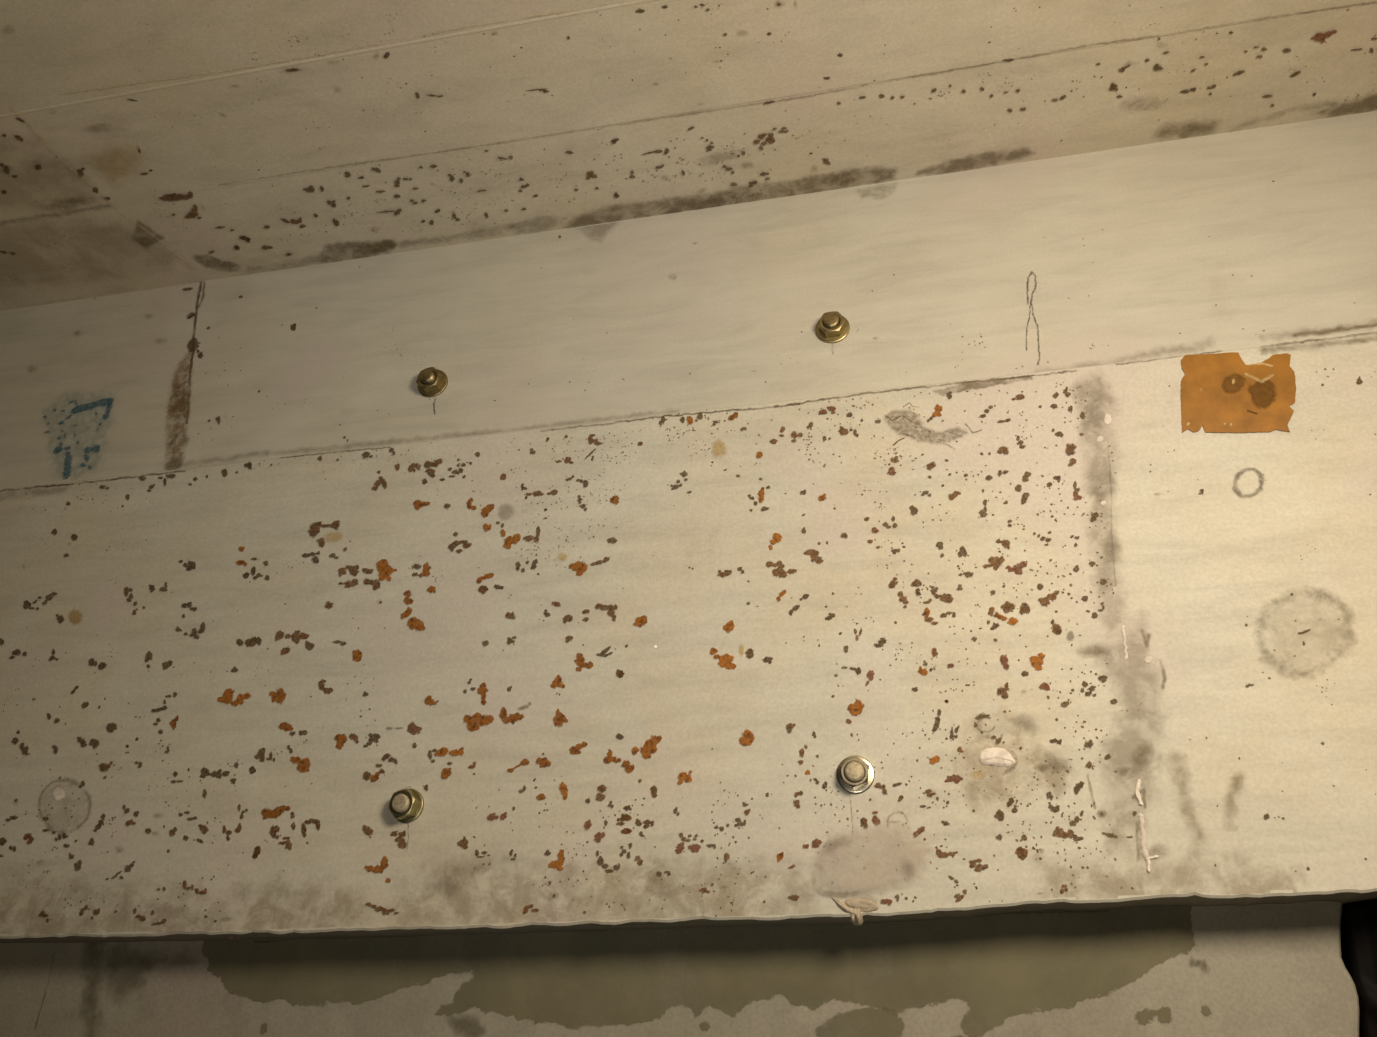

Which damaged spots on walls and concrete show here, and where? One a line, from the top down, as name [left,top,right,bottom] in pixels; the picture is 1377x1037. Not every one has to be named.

damp [779,170,894,196]
damp [921,150,1030,173]
damp [572,190,760,227]
damp [327,241,395,262]
rust [338,547,397,590]
rust [983,539,1027,574]
rust [889,577,954,625]
rust [988,590,1062,634]
rust [551,601,617,689]
rust [464,682,524,731]
rust [604,735,662,773]
rust [252,805,320,859]